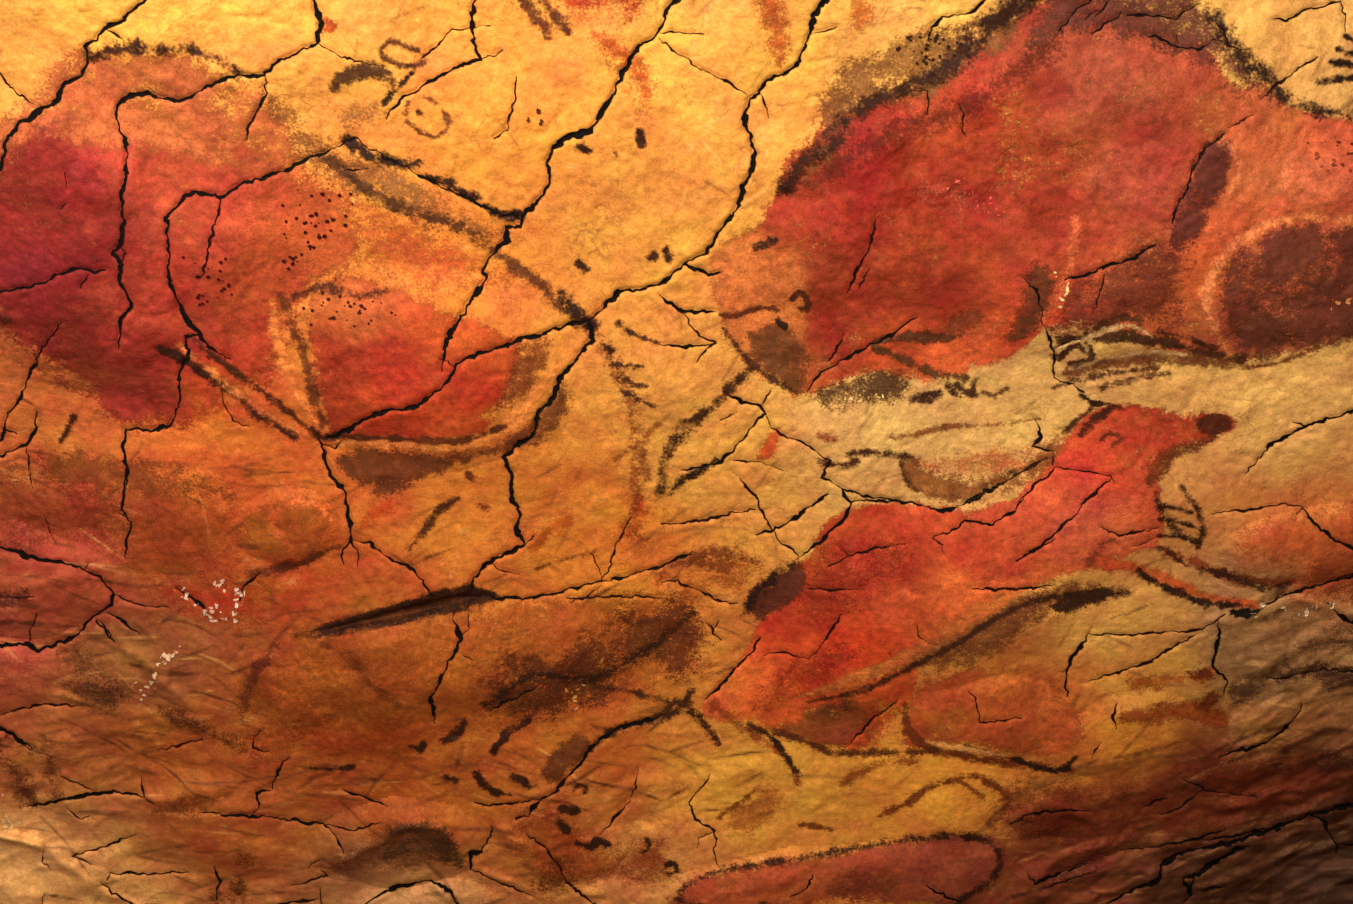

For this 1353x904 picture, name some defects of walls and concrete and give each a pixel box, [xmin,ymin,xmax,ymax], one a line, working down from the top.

crack [1058,0,1245,51]
crack [1274,0,1346,33]
crack [1023,56,1318,393]
crack [0,0,1156,724]
crack [1244,409,1353,475]
crack [1212,503,1353,624]
crack [1060,614,1228,758]
crack [27,776,222,904]
crack [202,730,389,904]
crack [365,715,662,904]
crack [688,773,719,867]
crack [1028,779,1353,904]